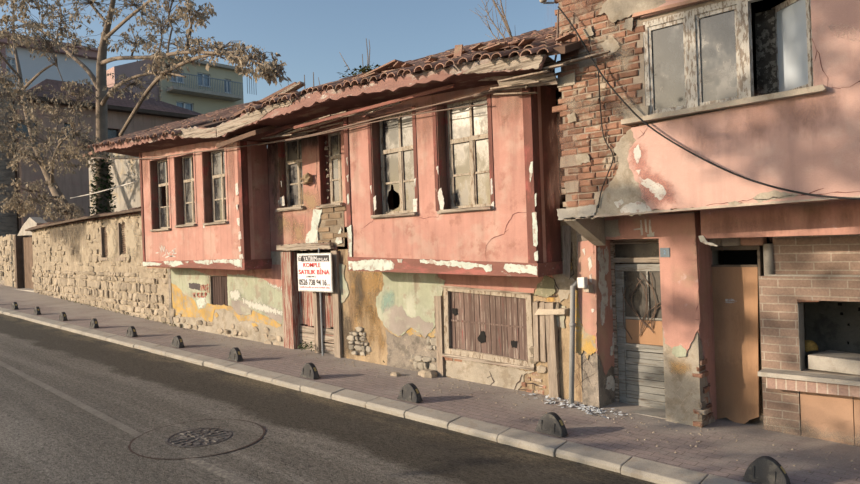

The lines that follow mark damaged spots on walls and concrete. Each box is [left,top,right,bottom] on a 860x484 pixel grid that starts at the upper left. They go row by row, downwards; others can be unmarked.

crack [812,39,860,89]
flaking render [552,0,835,237]
flaking render [31,183,283,346]
flaking render [300,173,313,185]
flaking render [306,141,403,275]
water stain [353,271,391,328]
peeling [420,259,492,272]
peeling [504,193,538,275]
peeling [582,246,612,326]
spalling [692,358,715,427]